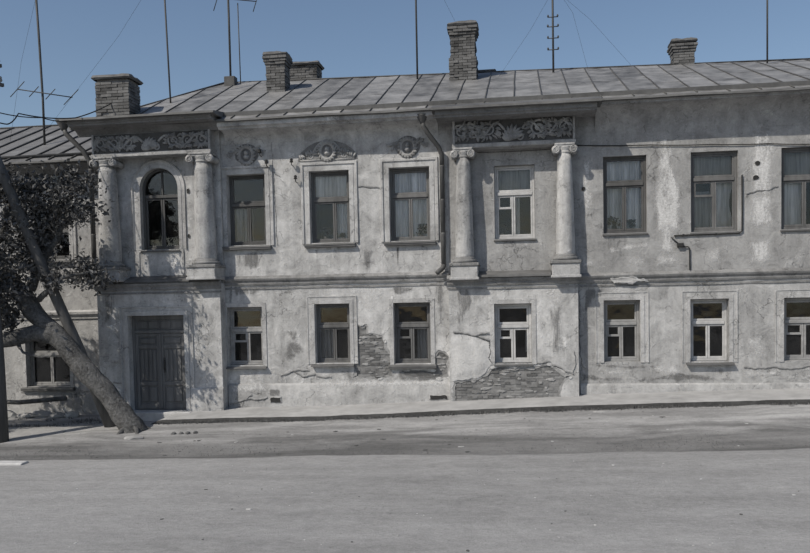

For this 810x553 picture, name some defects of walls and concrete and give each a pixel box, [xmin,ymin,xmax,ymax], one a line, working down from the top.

crack [746,185,778,195]
crack [453,331,492,363]
spalling [353,323,572,401]
crack [744,363,810,371]
crack [281,368,332,379]